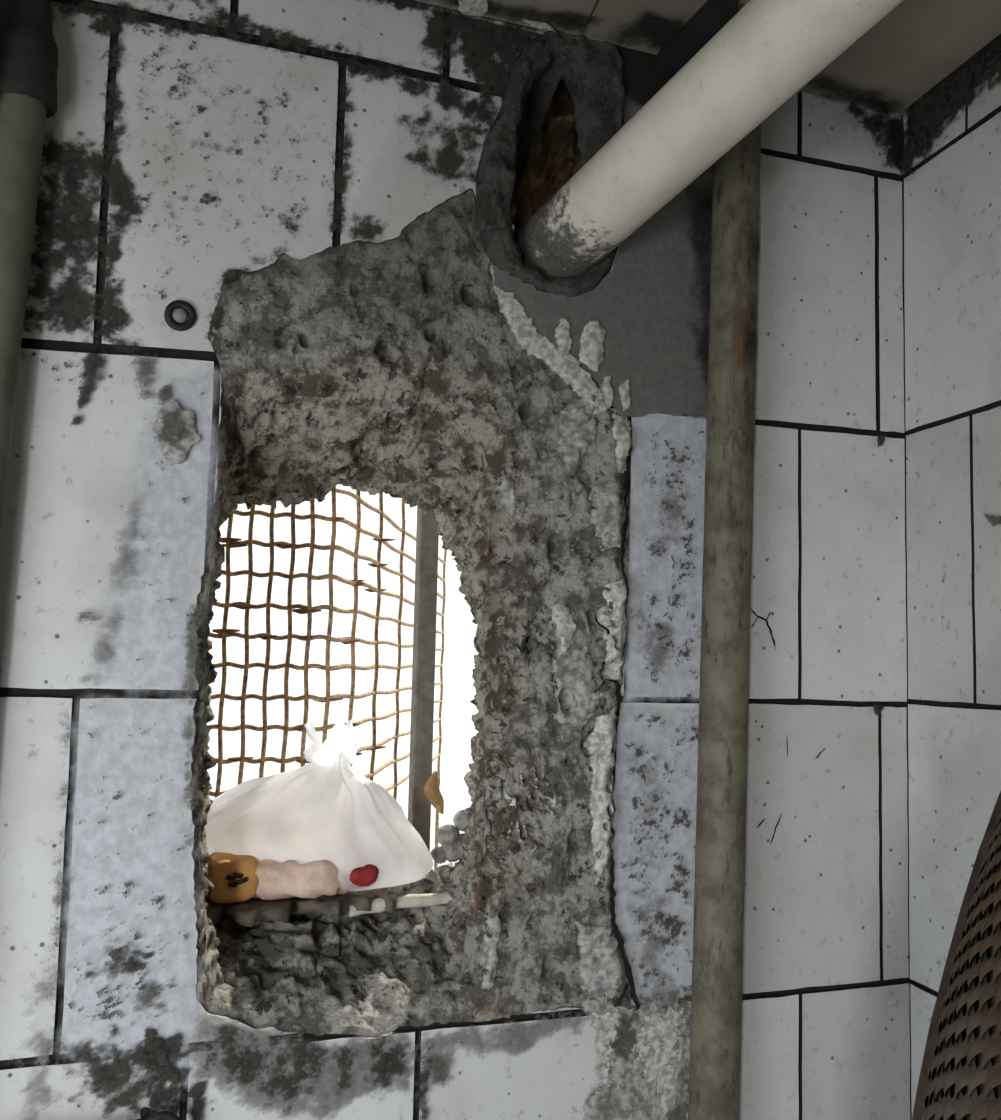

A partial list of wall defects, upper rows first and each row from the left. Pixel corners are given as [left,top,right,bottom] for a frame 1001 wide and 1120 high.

water stain [23,0,545,425]
water stain [848,34,1001,179]
corrosion [219,537,248,548]
spalling [189,29,636,1038]
crack [595,614,610,635]
crack [620,424,632,593]
water stain [637,431,704,683]
water stain [25,605,699,1120]
crack [591,676,640,1011]